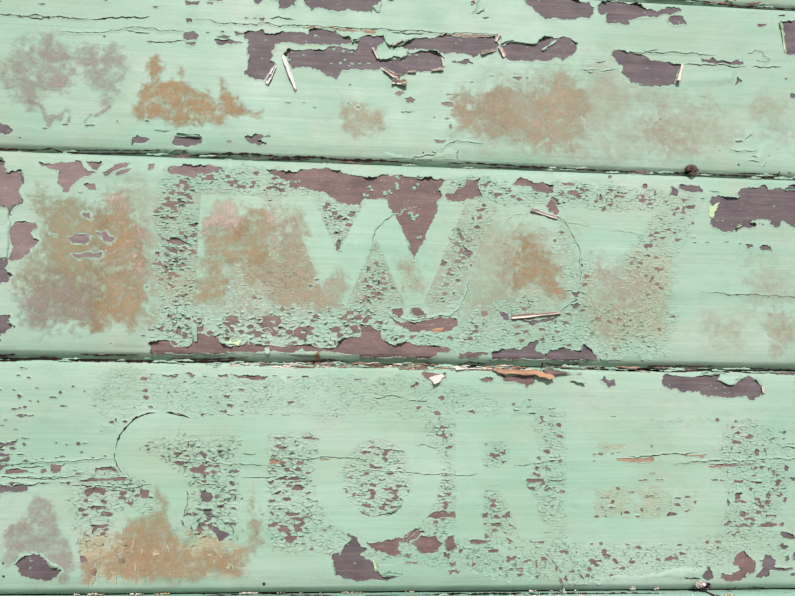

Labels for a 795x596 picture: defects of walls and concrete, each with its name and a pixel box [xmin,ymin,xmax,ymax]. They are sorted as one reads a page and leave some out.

corrosion [135,55,256,124]
peeling [253,0,394,14]
peeling [183,17,578,113]
peeling [609,49,683,89]
peeling [777,13,795,57]
peeling [0,122,23,140]
peeling [38,159,132,194]
corrosion [17,195,145,331]
peeling [139,160,795,362]
peeling [0,314,15,342]
peeling [0,363,795,587]
corrosion [82,513,240,580]